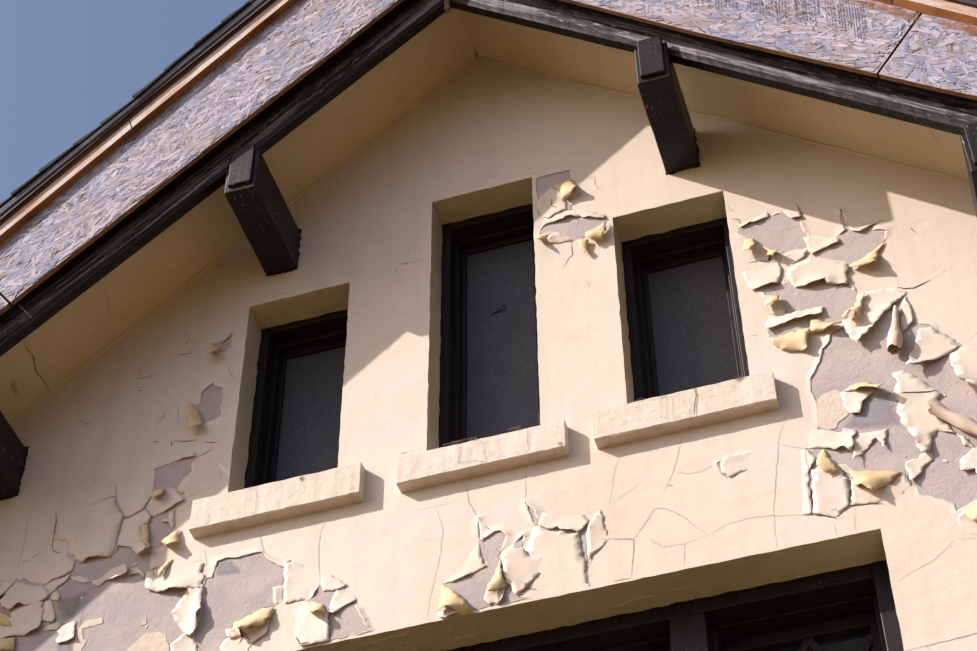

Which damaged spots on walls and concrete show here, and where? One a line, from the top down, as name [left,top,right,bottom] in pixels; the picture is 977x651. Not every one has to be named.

peeling [532,165,606,253]
peeling [0,451,376,651]
peeling [185,379,230,427]
peeling [437,497,608,617]
crack [616,384,881,581]
peeling [735,205,977,536]